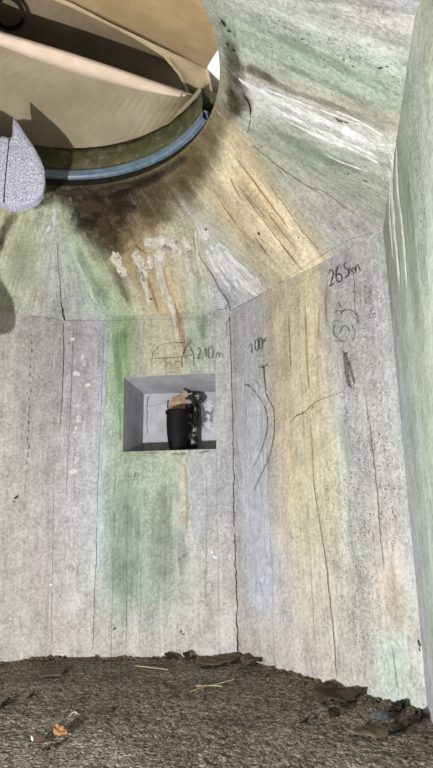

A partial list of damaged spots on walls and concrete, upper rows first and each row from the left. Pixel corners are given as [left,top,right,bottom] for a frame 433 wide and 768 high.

crack [244,96,358,217]
leakage [154,252,179,346]
crack [22,249,122,648]
crack [193,185,374,670]
crack [364,387,384,567]